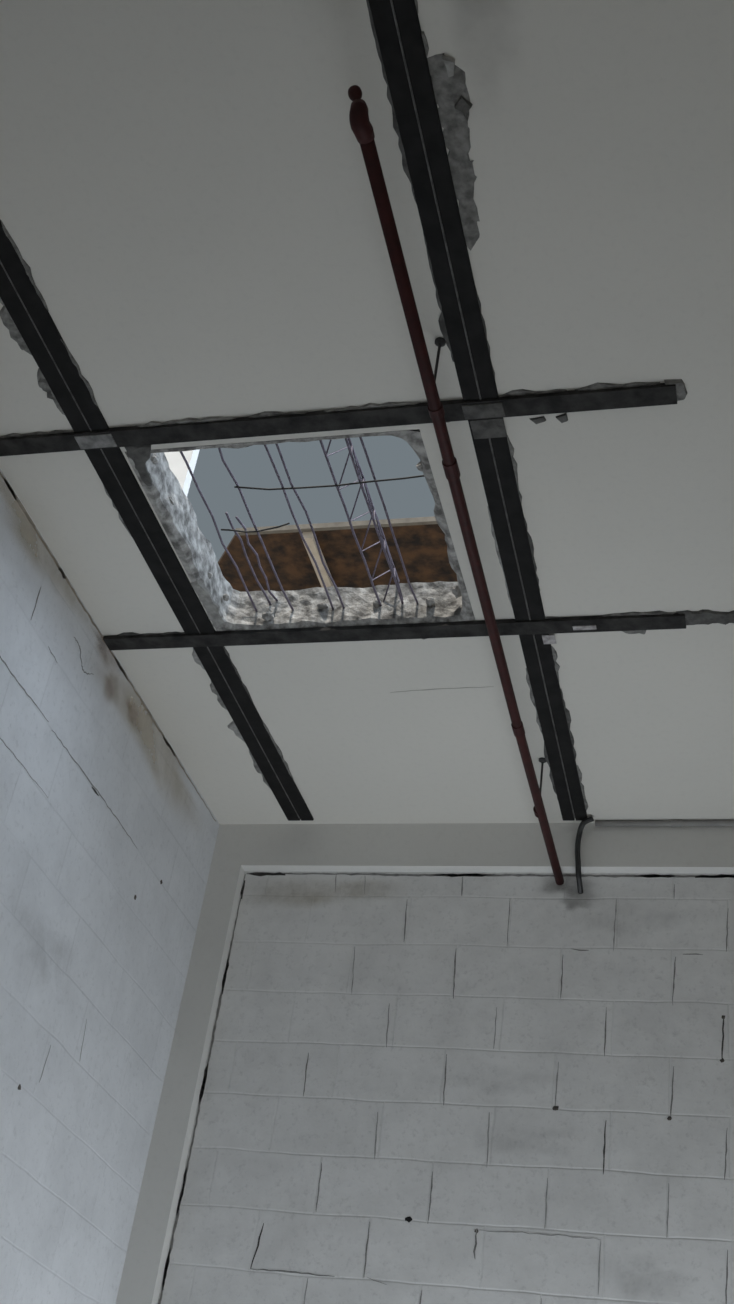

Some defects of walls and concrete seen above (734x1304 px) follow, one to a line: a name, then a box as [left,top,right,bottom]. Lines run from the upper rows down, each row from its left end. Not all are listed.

flaking render [421,31,480,251]
flaking render [0,298,74,438]
spalling [128,429,475,631]